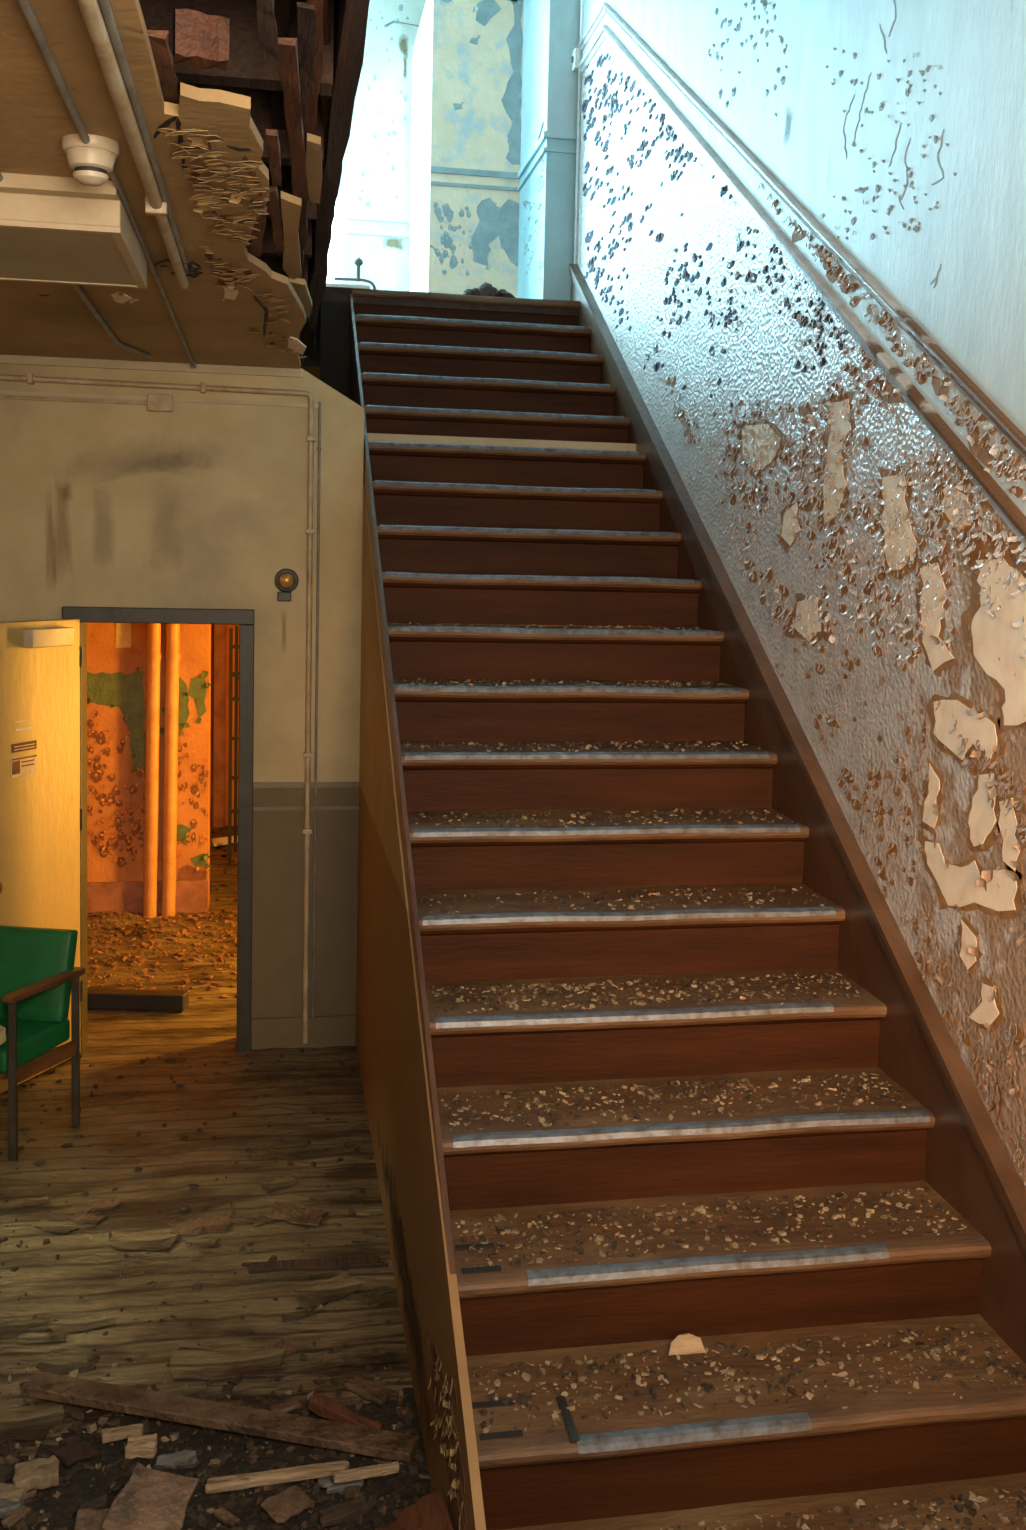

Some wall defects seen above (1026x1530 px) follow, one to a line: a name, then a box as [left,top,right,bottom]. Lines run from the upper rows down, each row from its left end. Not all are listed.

peeling [469,0,523,167]
peeling [430,156,545,283]
peeling [582,48,1026,1186]
peeling [87,667,211,890]